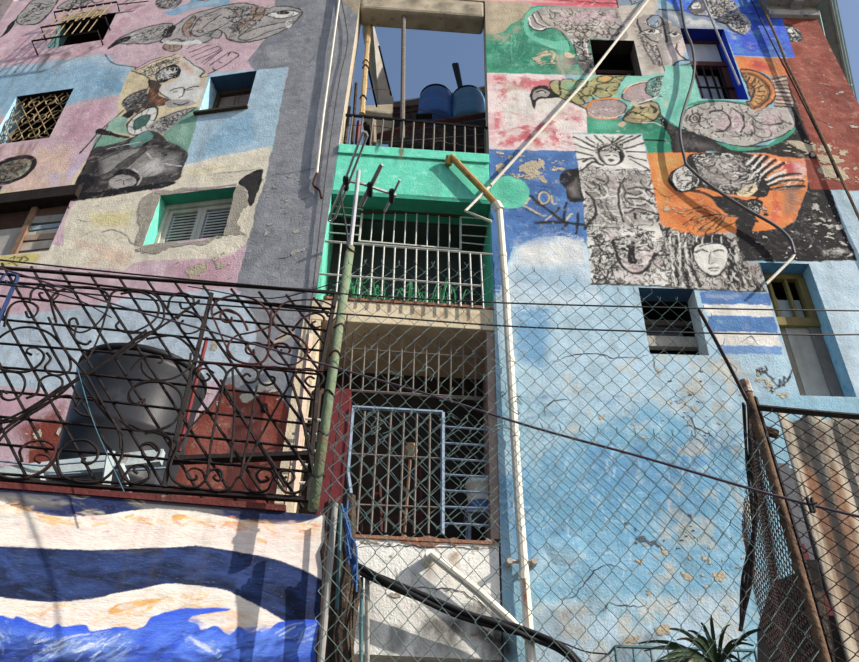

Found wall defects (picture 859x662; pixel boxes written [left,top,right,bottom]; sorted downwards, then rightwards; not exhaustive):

peeling [783,140,859,183]
flaking render [135,171,277,254]
rust [804,466,831,549]
flaking render [625,513,695,556]
crack [562,564,623,599]
flaking render [665,546,727,588]